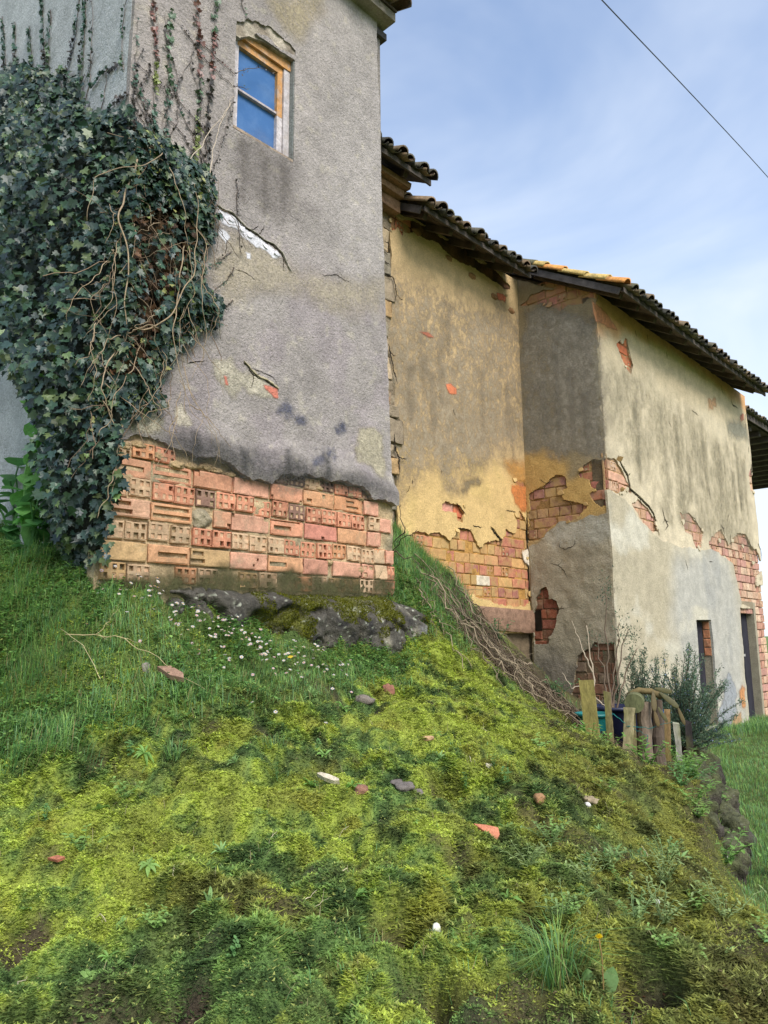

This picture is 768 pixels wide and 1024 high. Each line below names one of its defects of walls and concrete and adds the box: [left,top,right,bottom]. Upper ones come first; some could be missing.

crack [217,203,292,271]
spalling [355,216,631,484]
spalling [86,413,397,603]
spalling [410,453,659,644]
spalling [573,639,628,700]
crack [618,456,668,535]
spalling [680,513,768,715]